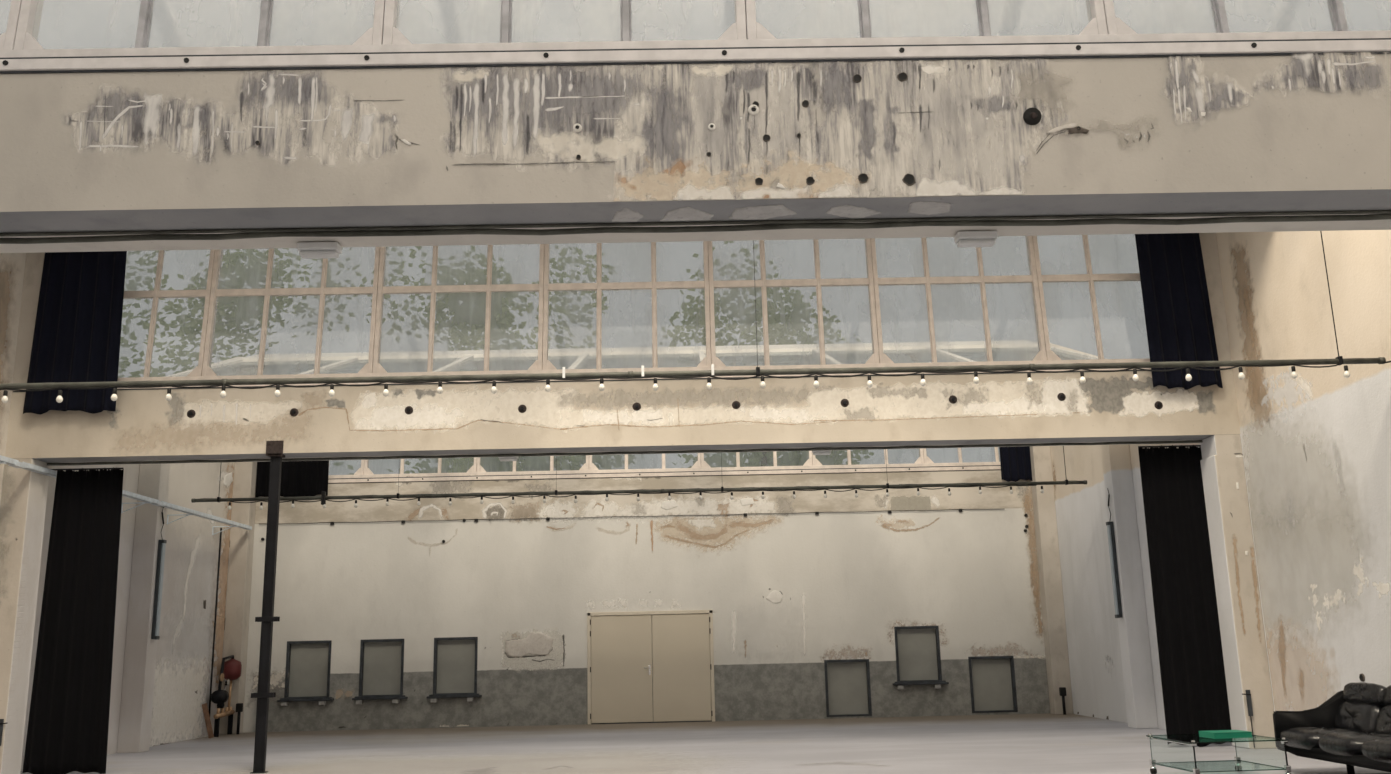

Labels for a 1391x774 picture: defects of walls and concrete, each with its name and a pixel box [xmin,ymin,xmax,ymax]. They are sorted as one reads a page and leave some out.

peeling [265,76,274,112]
peeling [145,96,161,133]
spalling [1037,123,1089,153]
flaking render [612,161,881,222]
peeling [907,201,951,215]
damp [1234,250,1270,427]
flaking render [182,380,1088,431]
damp [627,520,772,550]